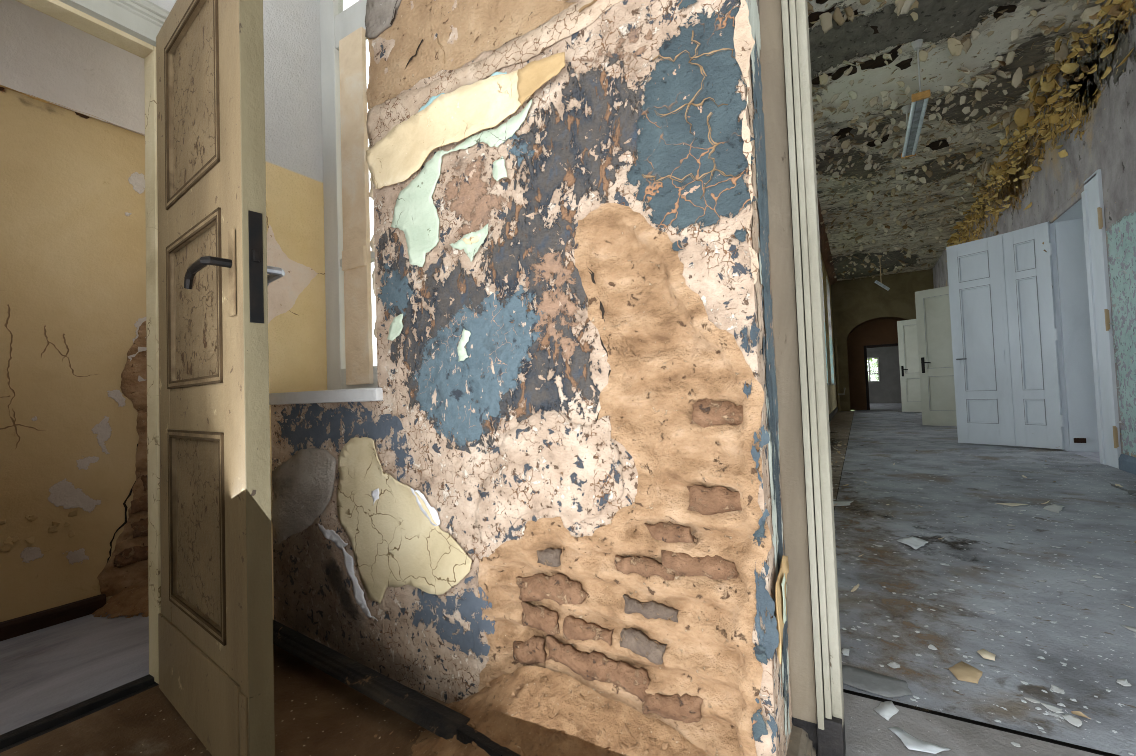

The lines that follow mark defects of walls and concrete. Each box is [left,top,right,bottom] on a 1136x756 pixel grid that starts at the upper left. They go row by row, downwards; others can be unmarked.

spalling [366,0,577,109]
peeling [676,0,697,10]
peeling [366,52,566,341]
peeling [807,0,1136,280]
peeling [266,216,325,324]
crack [0,304,40,448]
crack [41,326,97,377]
peeling [47,479,101,513]
spalling [97,317,148,597]
spalling [318,203,789,756]